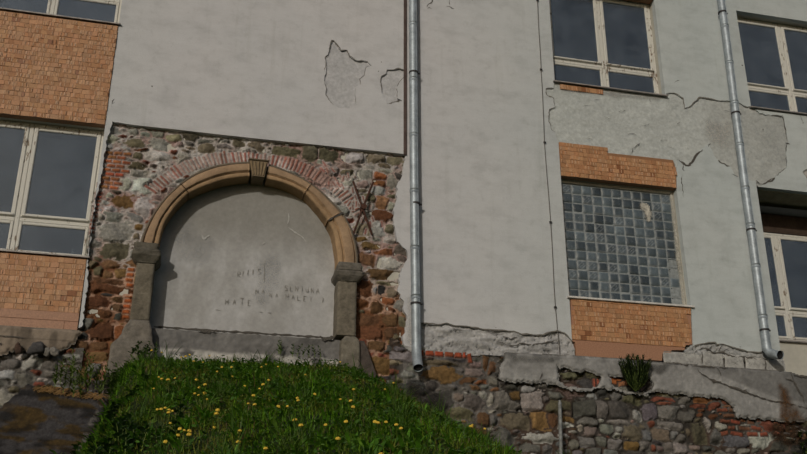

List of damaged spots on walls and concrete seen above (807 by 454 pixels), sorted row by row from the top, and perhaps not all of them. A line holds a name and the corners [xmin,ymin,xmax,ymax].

flaking render [324,40,404,108]
flaking render [545,83,787,188]
flaking render [76,124,575,389]
flaking render [684,342,767,360]